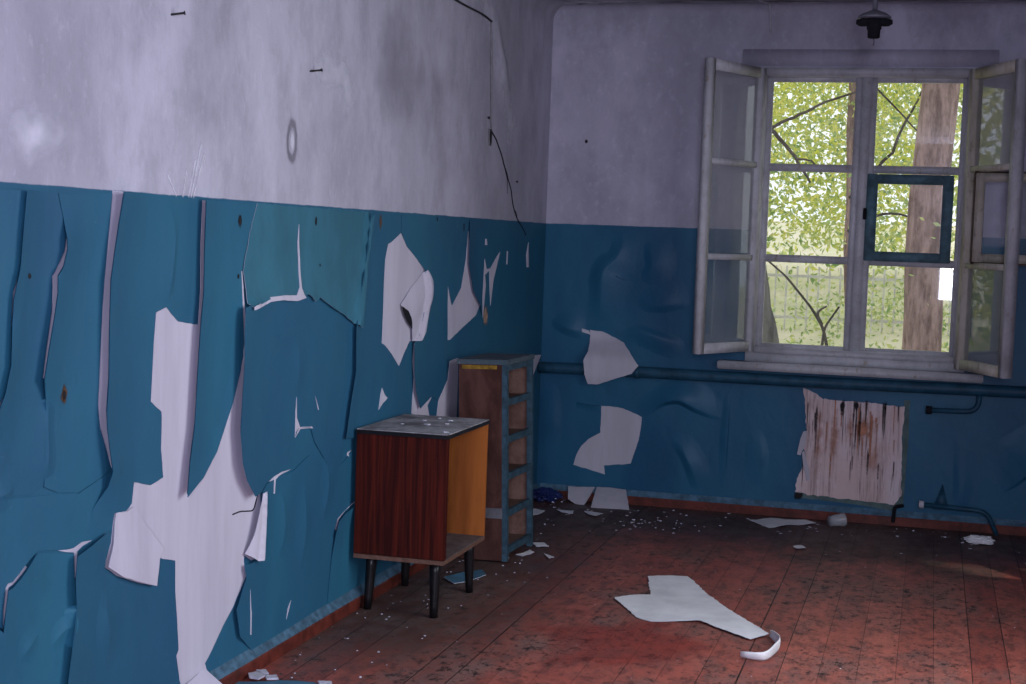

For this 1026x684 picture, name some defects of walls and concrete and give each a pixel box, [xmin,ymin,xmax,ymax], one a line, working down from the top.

peeling [794,388,910,511]